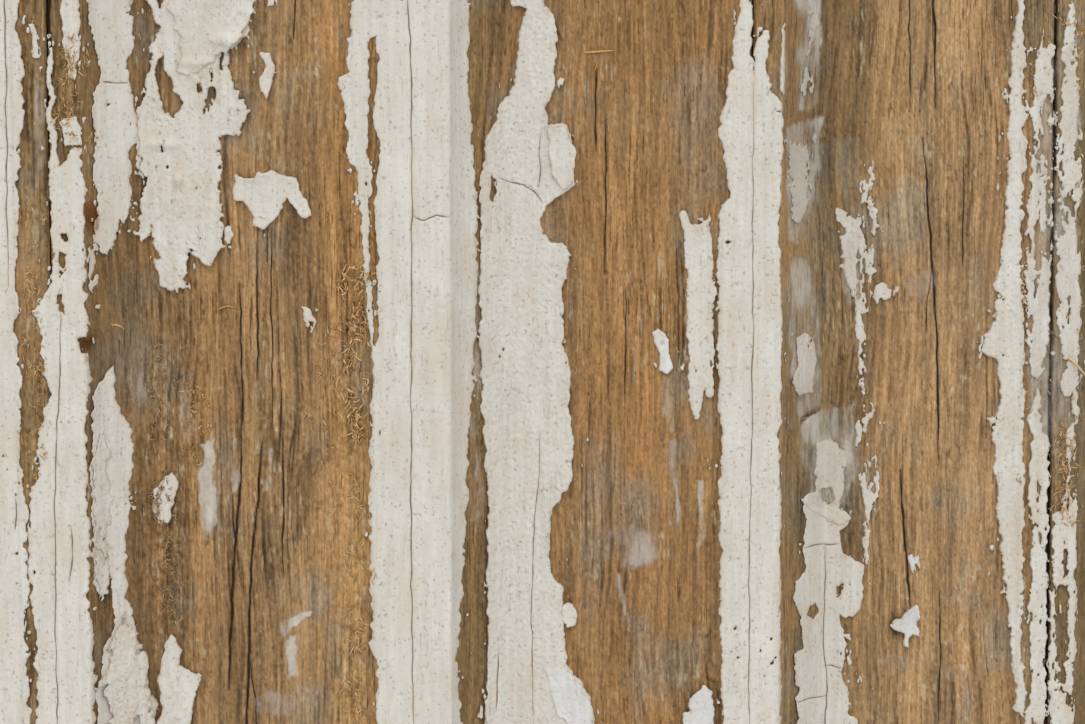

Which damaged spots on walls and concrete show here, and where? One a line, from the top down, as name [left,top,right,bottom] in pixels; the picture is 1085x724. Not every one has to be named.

peeling [0,0,311,724]
crack [229,243,285,724]
peeling [337,0,599,724]
peeling [652,0,899,724]
crack [900,470,911,607]
crack [908,0,936,95]
crack [935,592,943,724]
peeling [977,0,1085,724]